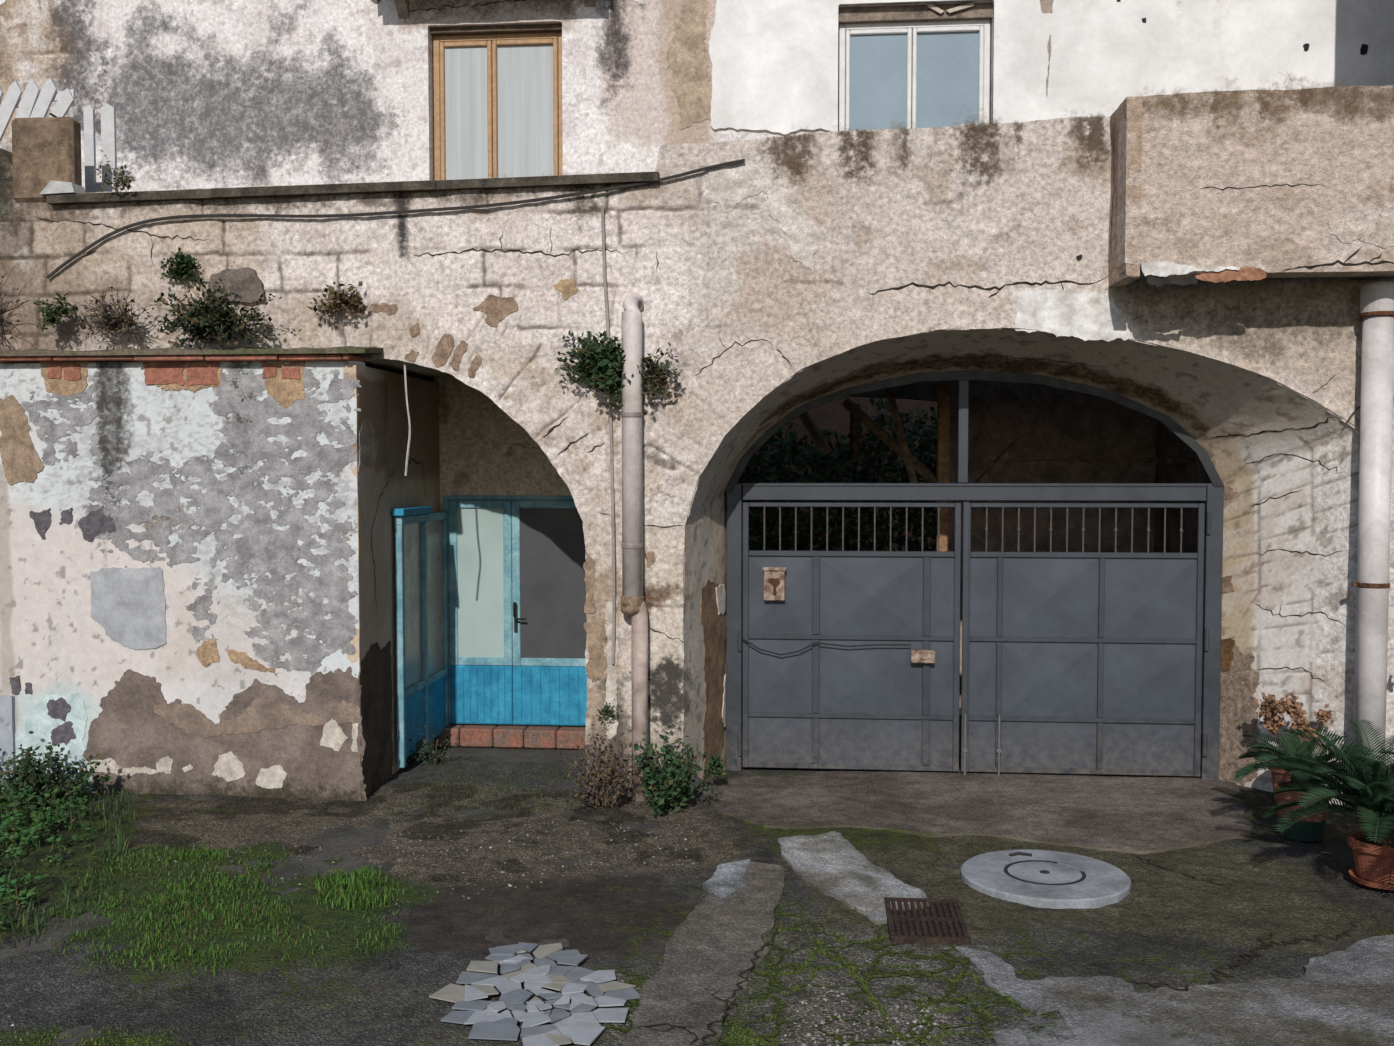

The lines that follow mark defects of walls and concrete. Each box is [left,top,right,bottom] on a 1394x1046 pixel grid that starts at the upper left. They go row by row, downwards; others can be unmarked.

leakage [597,0,629,79]
leakage [51,0,391,212]
leakage [1076,116,1103,151]
leakage [359,193,410,256]
crack [869,138,1115,297]
crack [1282,248,1394,272]
spalling [473,294,519,327]
spalling [405,323,482,378]
crack [1211,371,1347,506]
peeling [0,361,394,801]
crack [1256,602,1348,628]
flaking render [700,579,726,782]